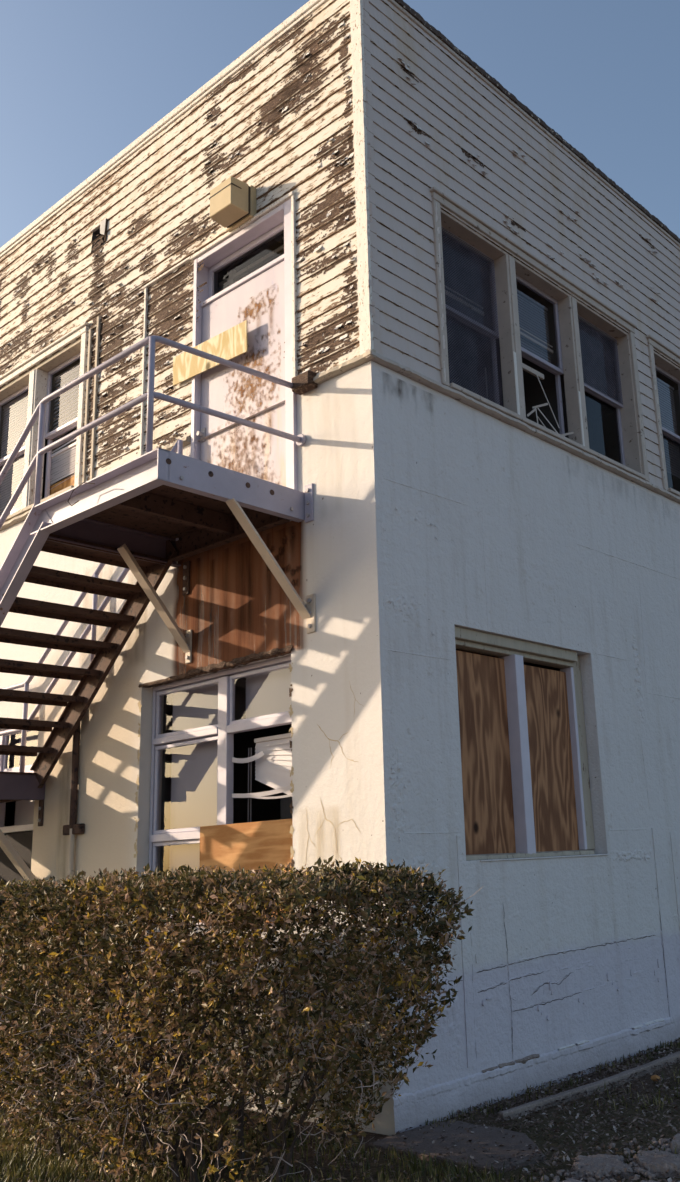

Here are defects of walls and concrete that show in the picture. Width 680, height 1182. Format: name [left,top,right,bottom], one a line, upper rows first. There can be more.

peeling [199,2,371,374]
peeling [404,117,431,146]
peeling [461,148,488,176]
corrosion [238,290,274,319]
peeling [0,211,221,481]
corrosion [227,336,280,422]
corrosion [218,433,266,479]
crack [317,686,361,762]
crack [305,799,359,863]
crack [404,869,669,1059]